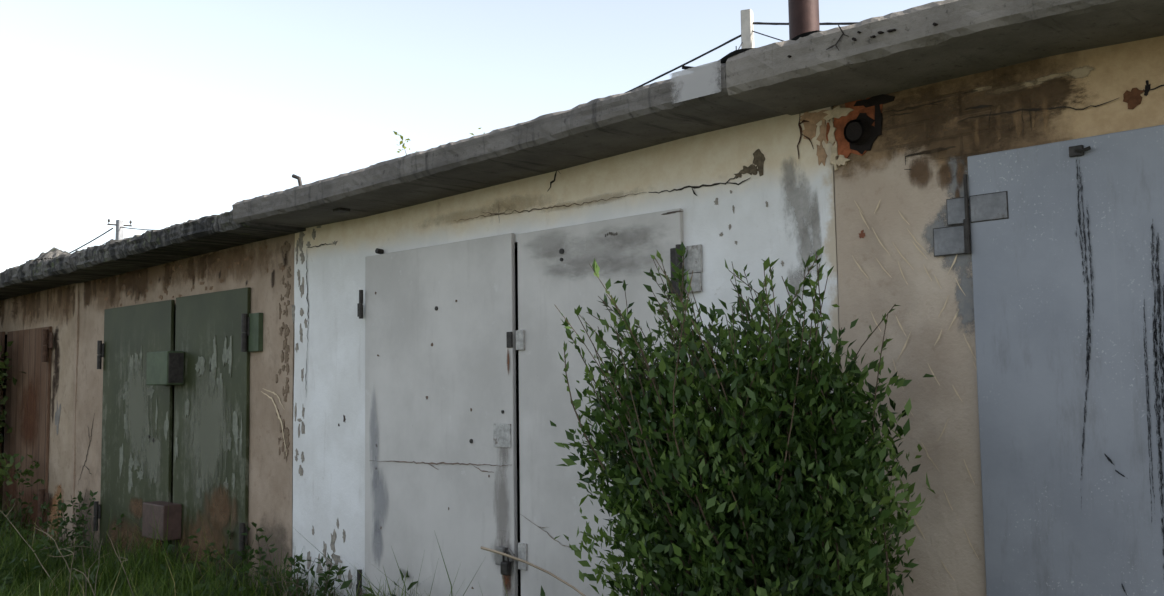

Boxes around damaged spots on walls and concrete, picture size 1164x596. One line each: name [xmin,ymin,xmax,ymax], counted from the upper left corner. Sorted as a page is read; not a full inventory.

flaking render [800,94,895,171]
crack [885,90,1118,170]
water stain [974,66,1093,95]
flaking render [1123,80,1150,109]
crack [455,164,753,221]
water stain [784,165,821,295]
flaking render [92,225,322,499]
crack [369,460,507,473]